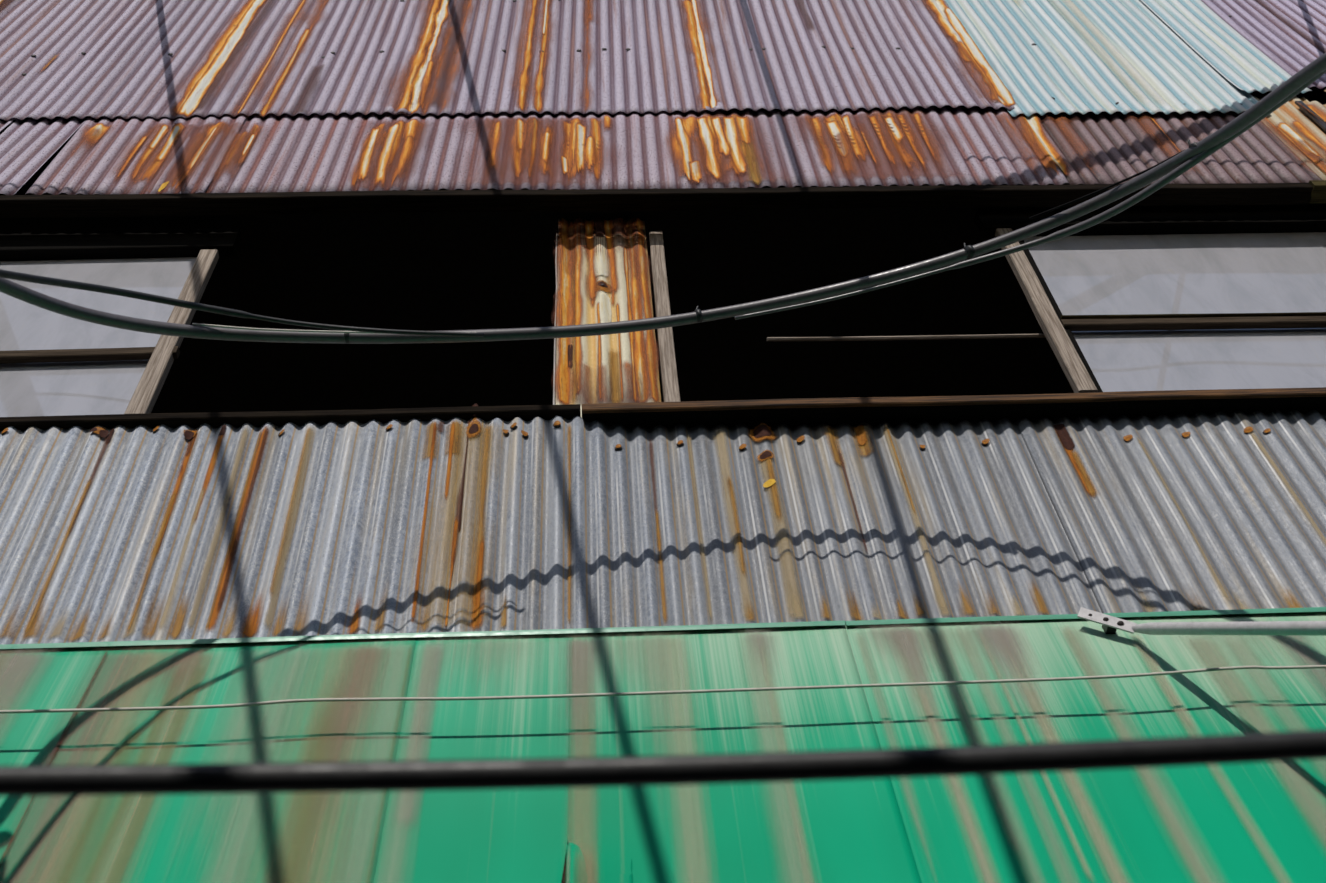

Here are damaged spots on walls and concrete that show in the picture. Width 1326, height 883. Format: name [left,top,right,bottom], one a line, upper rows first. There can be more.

rust [117,0,328,194]
rust [351,0,472,186]
rust [475,0,612,185]
rust [668,0,773,183]
rust [805,111,952,179]
rust [925,0,1087,175]
rust [1256,0,1326,53]
rust [1261,90,1326,173]
rust [412,404,528,630]
rust [553,216,661,621]
rust [716,422,803,620]
rust [1053,424,1095,495]